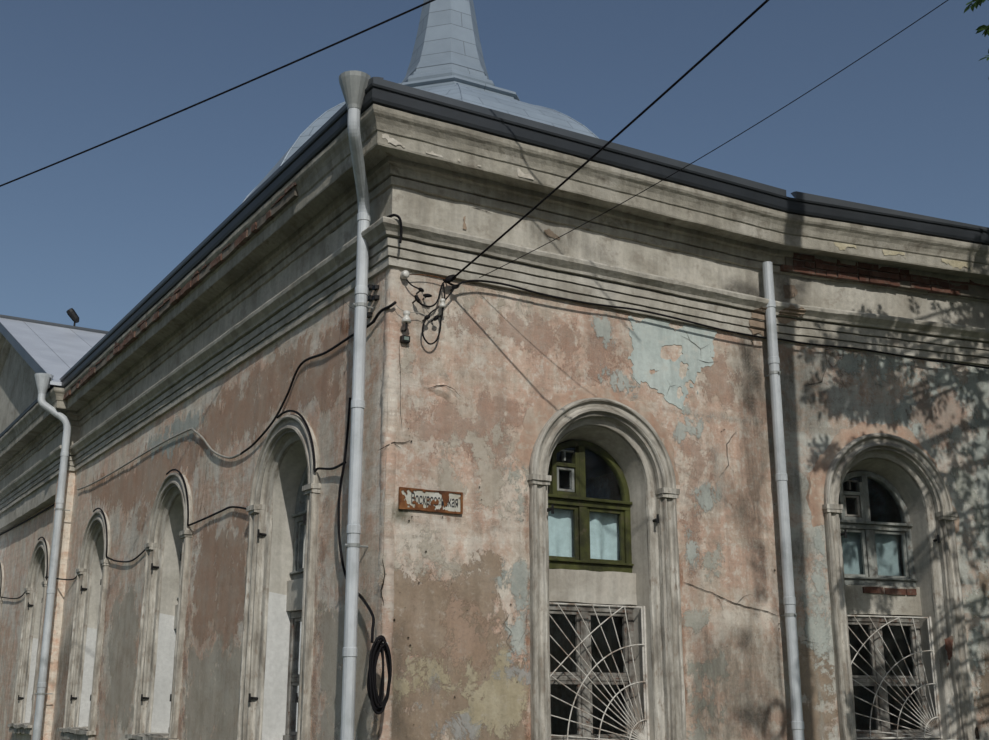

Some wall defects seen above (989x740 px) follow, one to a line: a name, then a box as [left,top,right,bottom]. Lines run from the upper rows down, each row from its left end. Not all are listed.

peeling [586,314,616,349]
flaking render [747,242,989,337]
peeling [597,316,717,446]
peeling [833,349,989,561]
crack [684,582,778,616]